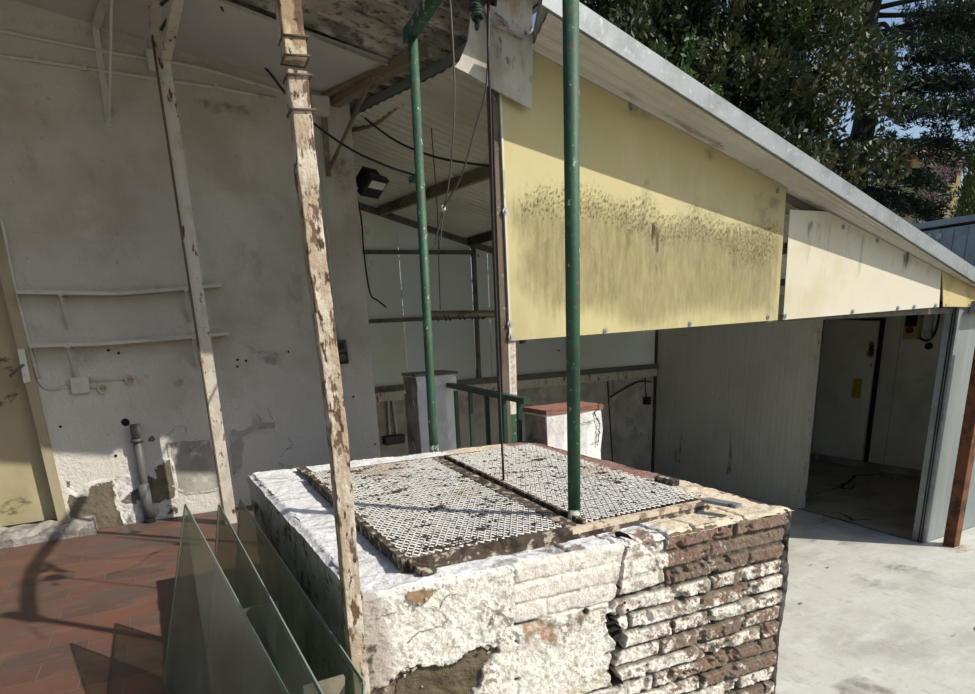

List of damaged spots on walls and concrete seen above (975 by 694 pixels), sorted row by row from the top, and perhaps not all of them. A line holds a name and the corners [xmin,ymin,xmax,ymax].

peeling [225,411,278,479]
peeling [62,435,219,528]
crack [797,474,923,543]
crack [615,531,634,589]
spalling [370,646,498,694]
crack [605,613,623,684]